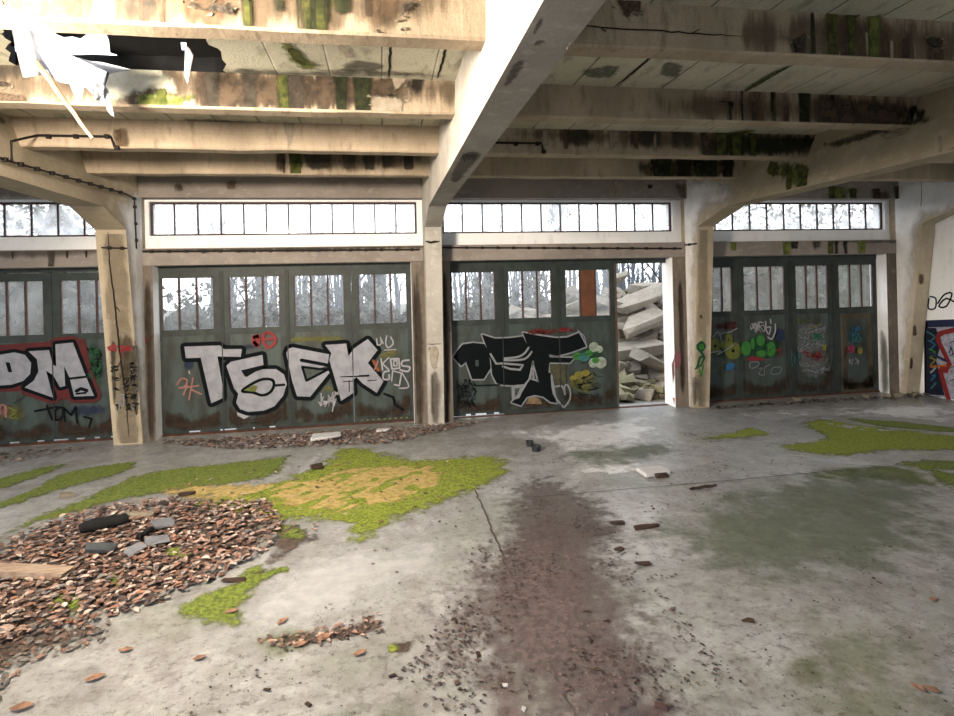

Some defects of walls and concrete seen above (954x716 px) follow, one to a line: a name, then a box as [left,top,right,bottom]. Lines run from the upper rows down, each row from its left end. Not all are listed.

damp [0,0,194,24]
damp [211,0,303,27]
damp [360,0,427,26]
crack [586,25,742,37]
damp [743,17,776,52]
damp [789,14,954,60]
spalling [0,80,30,101]
damp [451,152,480,182]
damp [525,129,734,198]
crack [475,461,946,614]